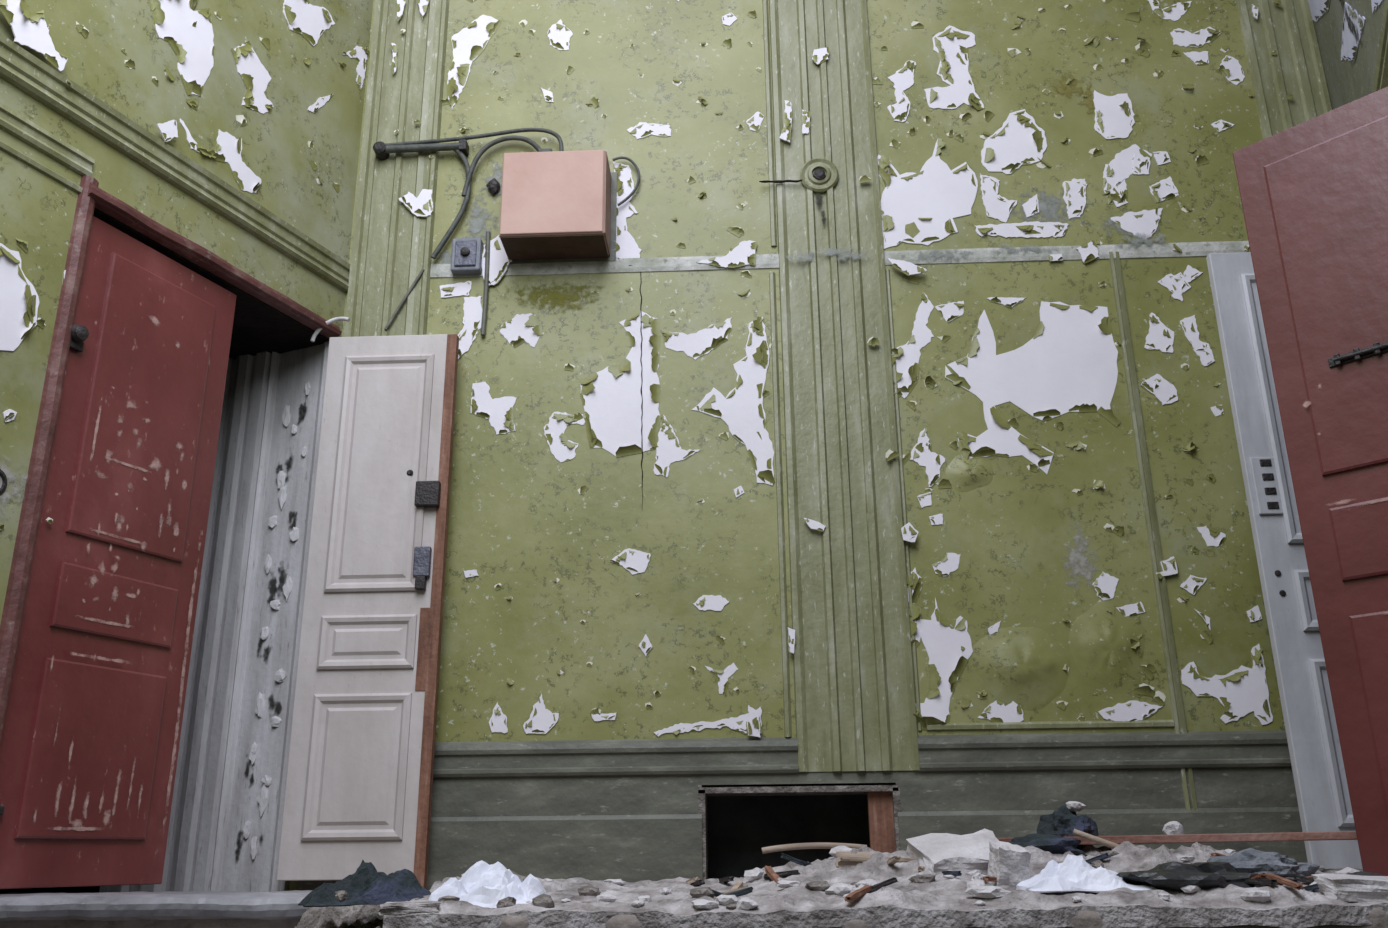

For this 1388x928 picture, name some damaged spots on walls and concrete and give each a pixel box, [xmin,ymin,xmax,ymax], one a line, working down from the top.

peeling [149,0,274,193]
peeling [441,0,502,109]
peeling [519,19,590,75]
peeling [1121,0,1254,97]
peeling [0,237,46,351]
peeling [859,21,1192,543]
peeling [1144,243,1221,386]
peeling [543,309,775,498]
peeling [906,553,1024,730]
peeling [1056,664,1166,722]
peeling [1181,643,1274,725]
peeling [1246,605,1262,622]